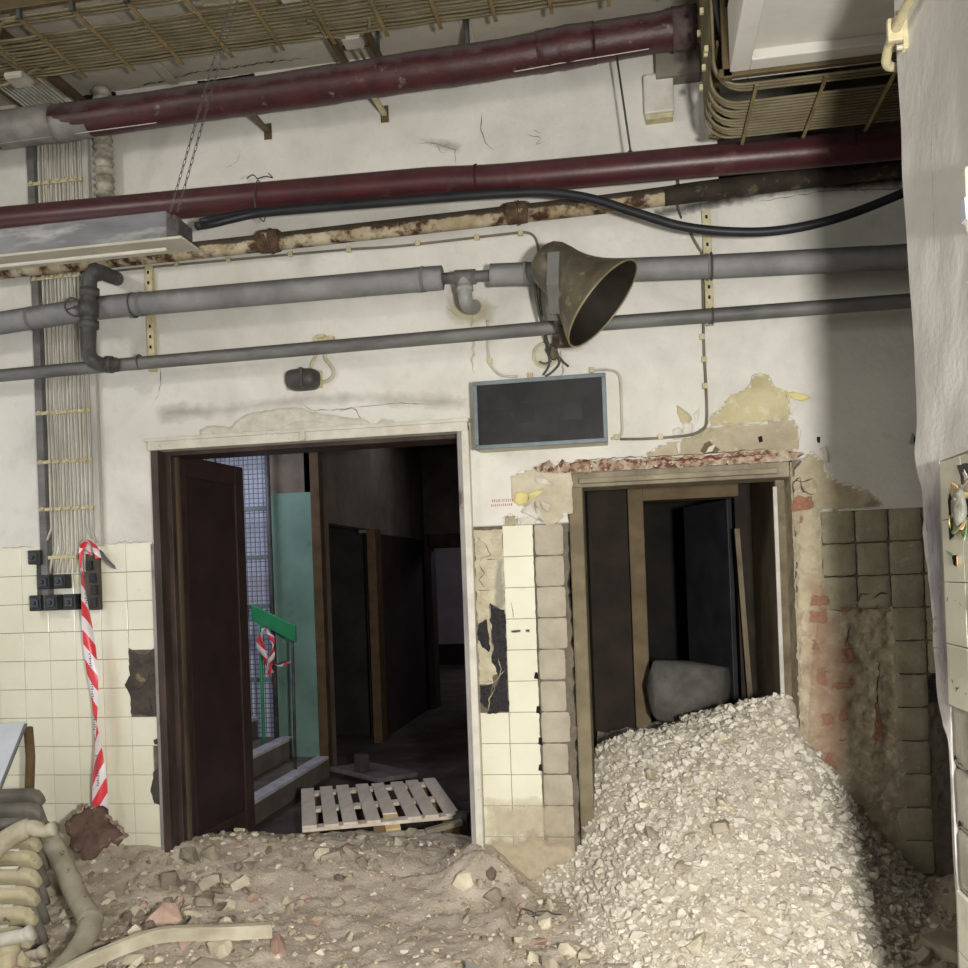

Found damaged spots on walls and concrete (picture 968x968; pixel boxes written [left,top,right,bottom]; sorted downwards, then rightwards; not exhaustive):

peeling [125,648,157,716]
flaking render [474,373,968,895]